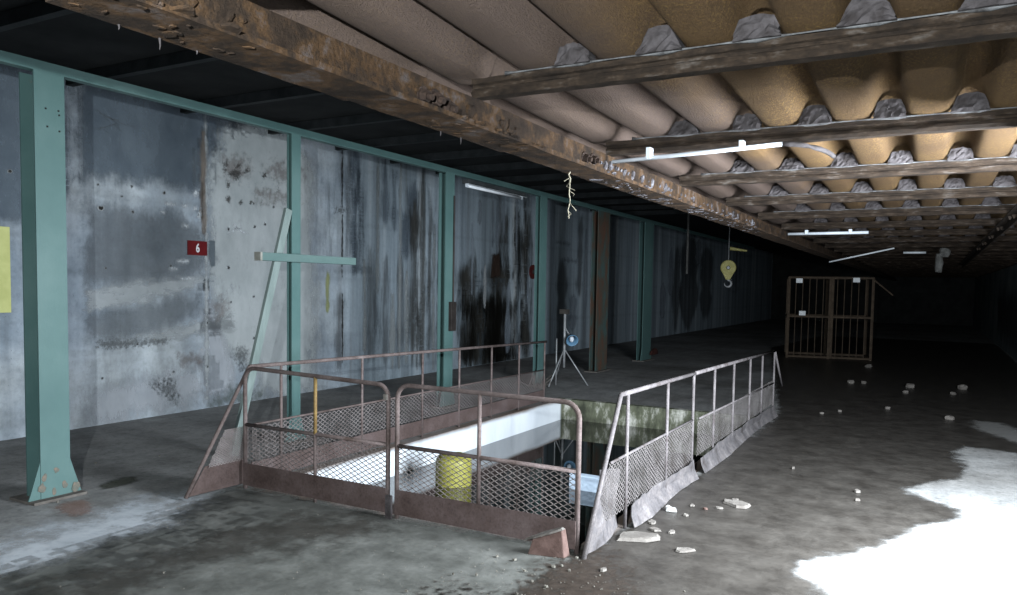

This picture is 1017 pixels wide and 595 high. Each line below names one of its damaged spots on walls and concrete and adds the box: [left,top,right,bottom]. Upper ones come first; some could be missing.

leakage [65,85,287,423]
leakage [300,154,319,392]
leakage [341,150,436,368]
leakage [457,195,532,366]
leakage [0,336,1017,595]